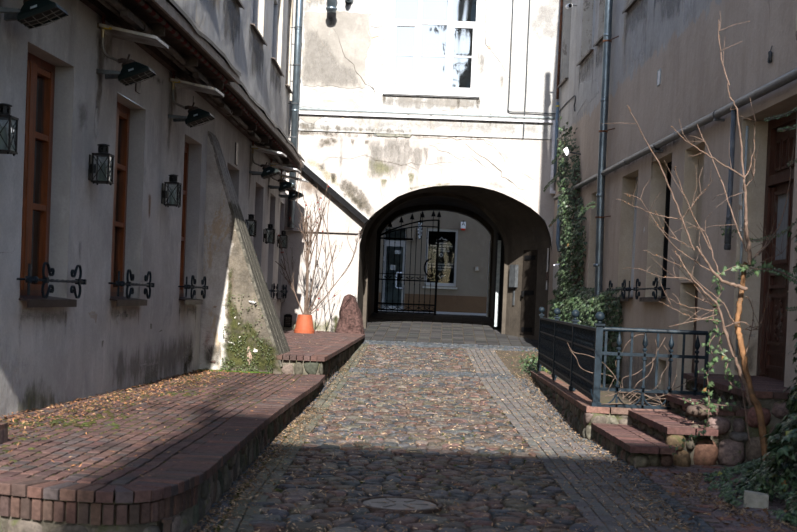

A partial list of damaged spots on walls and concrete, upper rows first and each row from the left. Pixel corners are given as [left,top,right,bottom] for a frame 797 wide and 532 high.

flaking render [313,89,365,122]
damp [365,123,426,184]
crack [344,107,526,201]
mould [331,174,371,214]